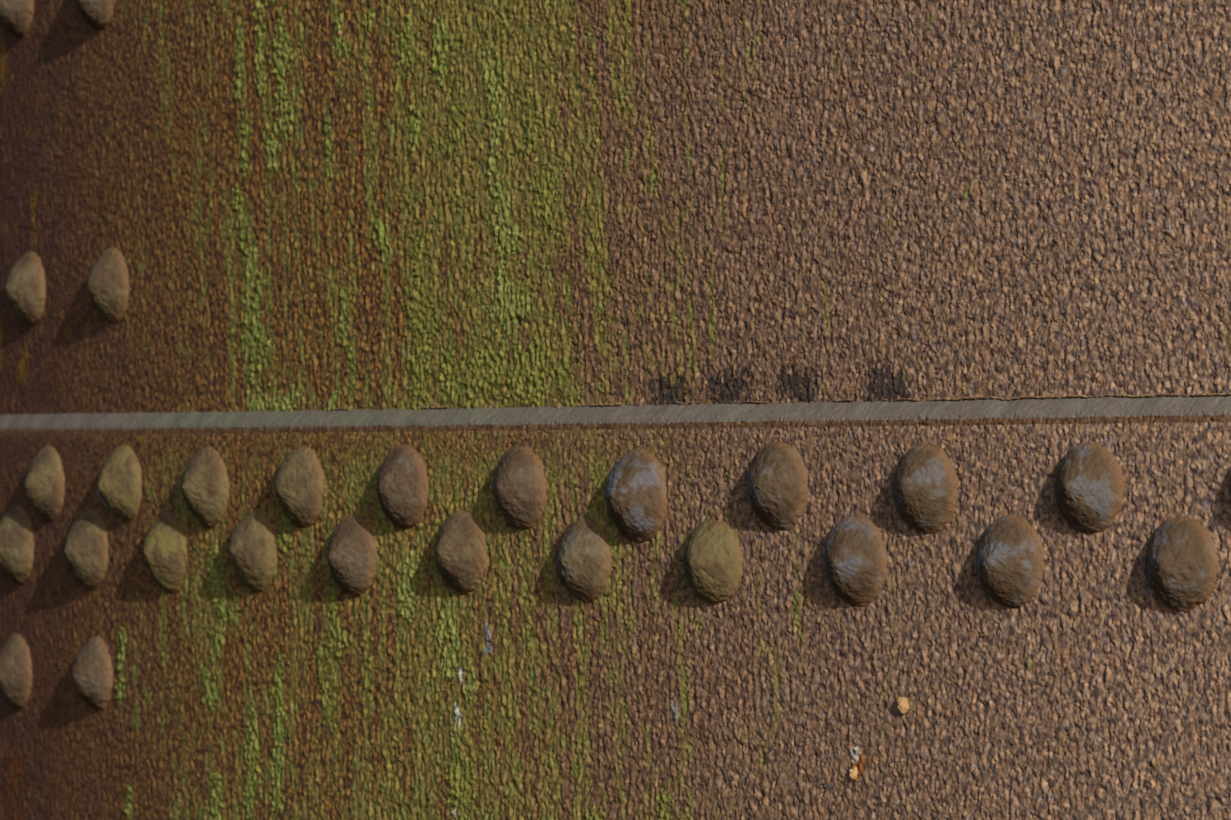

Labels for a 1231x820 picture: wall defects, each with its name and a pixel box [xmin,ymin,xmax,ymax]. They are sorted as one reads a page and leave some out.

rust [849,755,867,782]